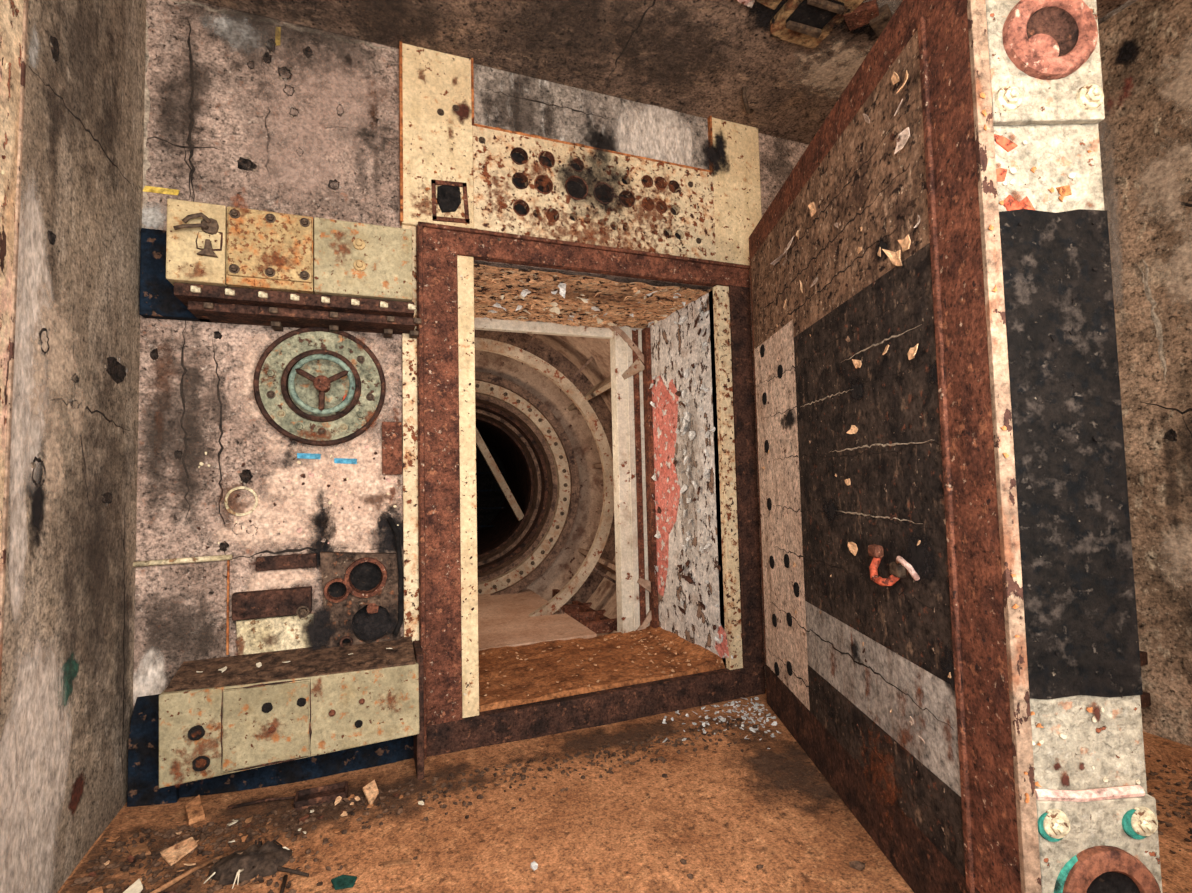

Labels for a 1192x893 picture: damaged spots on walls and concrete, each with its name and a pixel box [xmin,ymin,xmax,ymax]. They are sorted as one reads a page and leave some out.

spalling [29,31,60,66]
crack [29,0,399,228]
rust [449,58,713,173]
water stain [590,106,692,166]
water stain [715,132,727,162]
rust [422,171,470,225]
peeling [482,276,727,615]
peeling [603,630,700,675]
peeling [713,623,739,659]